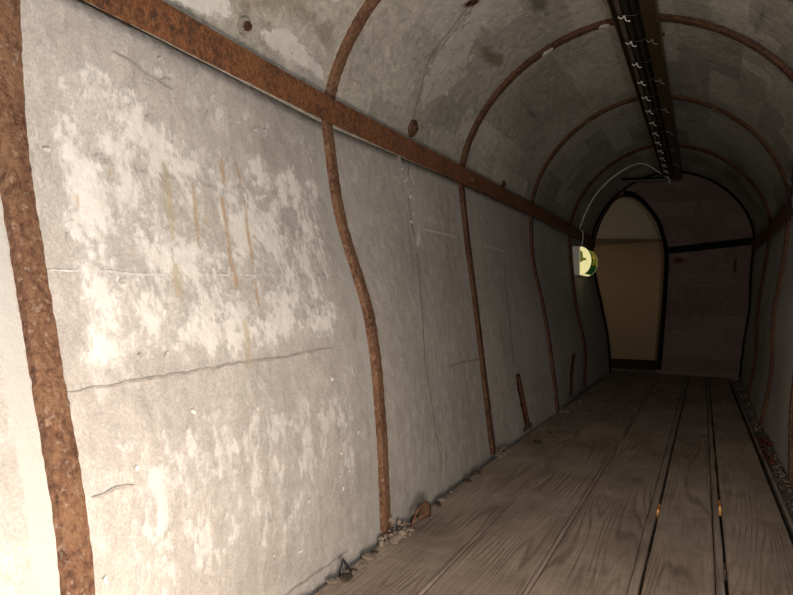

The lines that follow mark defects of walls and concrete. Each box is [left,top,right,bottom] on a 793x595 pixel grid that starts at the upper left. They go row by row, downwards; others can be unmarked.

crack [67,347,334,393]